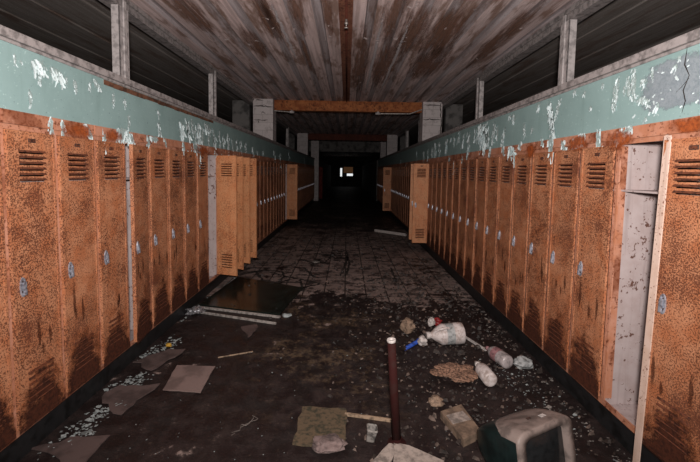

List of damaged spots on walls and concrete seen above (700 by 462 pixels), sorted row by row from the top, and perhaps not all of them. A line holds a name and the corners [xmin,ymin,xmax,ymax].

peeling [13,54,77,94]
peeling [48,117,65,136]
corrosion [63,124,90,138]
spalling [88,79,264,167]
peeling [536,98,586,164]
corrosion [570,136,586,151]
corrosion [610,129,633,150]
peeling [611,52,700,134]
crack [682,51,690,111]
corrosion [426,228,599,399]
corrosion [0,262,209,451]
corrosion [642,409,695,462]